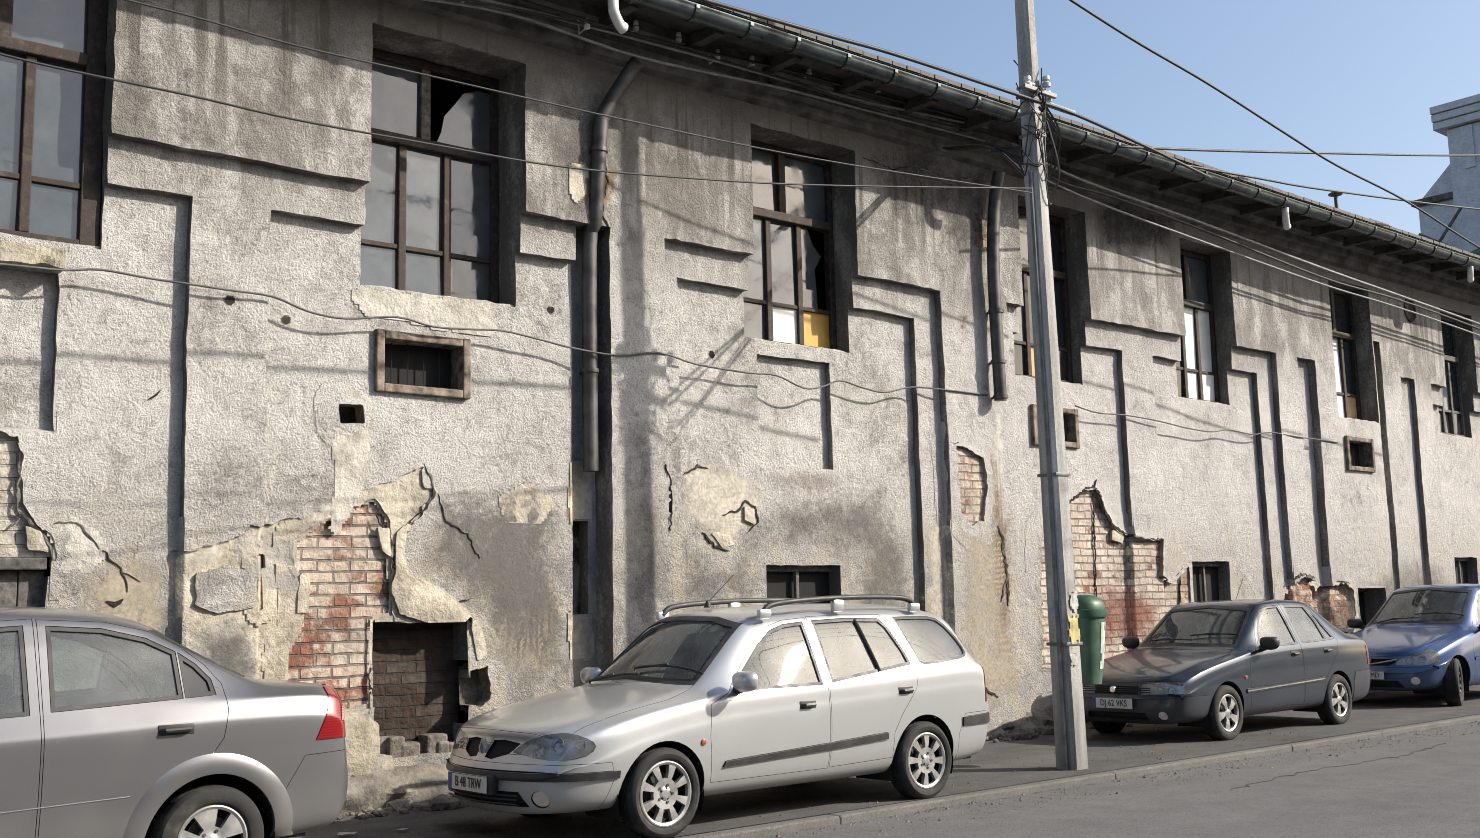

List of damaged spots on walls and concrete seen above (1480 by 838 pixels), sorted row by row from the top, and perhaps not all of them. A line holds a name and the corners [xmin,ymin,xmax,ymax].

peeling [569,162,589,203]
crack [103,550,139,608]
flaking render [0,378,464,720]
crack [665,464,673,531]
peeling [683,464,759,551]
flaking render [927,420,1052,701]
flaking render [1068,467,1197,659]
flaking render [1264,553,1361,634]